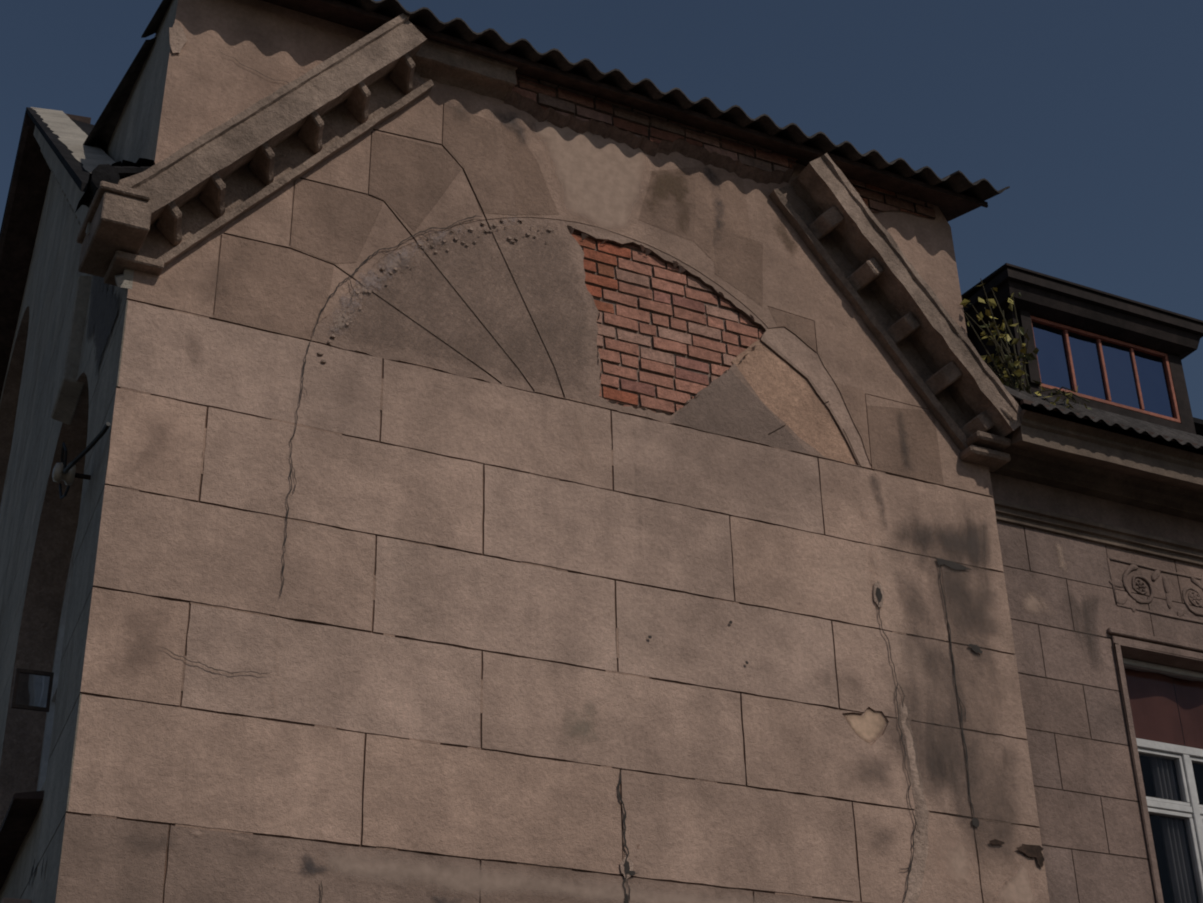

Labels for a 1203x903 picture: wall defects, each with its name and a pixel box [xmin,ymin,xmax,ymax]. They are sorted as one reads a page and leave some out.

crack [279,215,482,599]
flaking render [317,73,857,465]
crack [618,768,637,901]
flaking render [847,711,885,741]
crack [878,602,921,903]